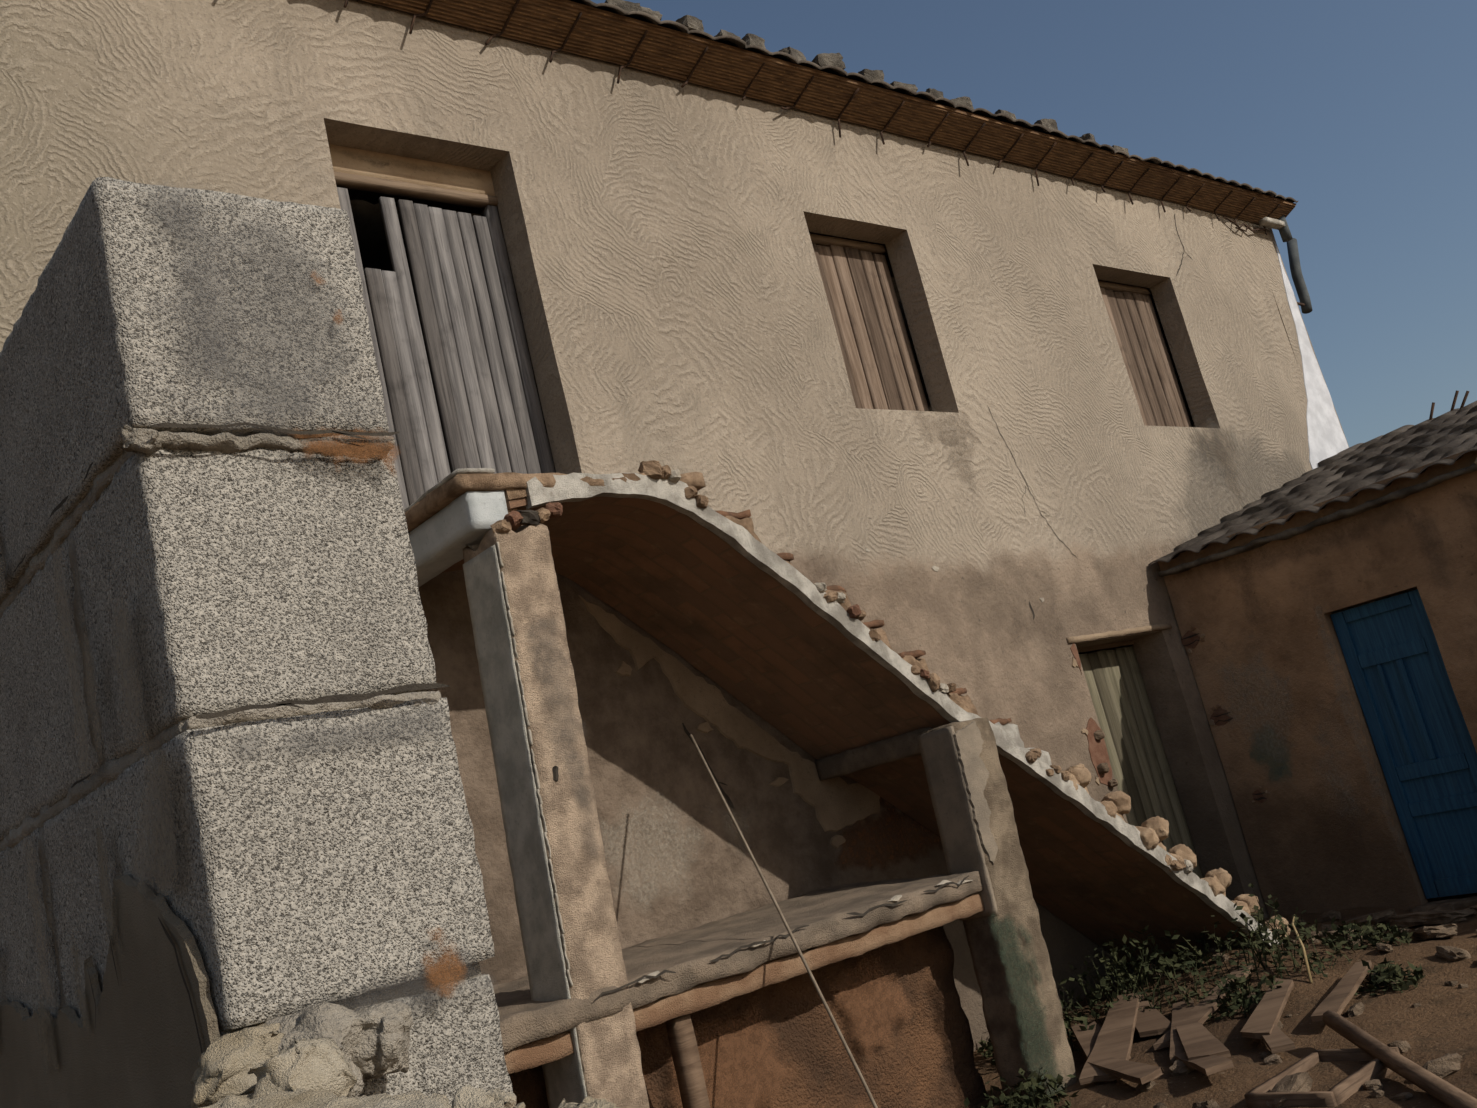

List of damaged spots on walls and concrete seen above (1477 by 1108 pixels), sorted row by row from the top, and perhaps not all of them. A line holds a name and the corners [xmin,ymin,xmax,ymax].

spalling [638,460,709,508]
crack [988,407,1077,558]
spalling [814,583,882,641]
spalling [911,665,956,694]
peeling [578,595,880,849]